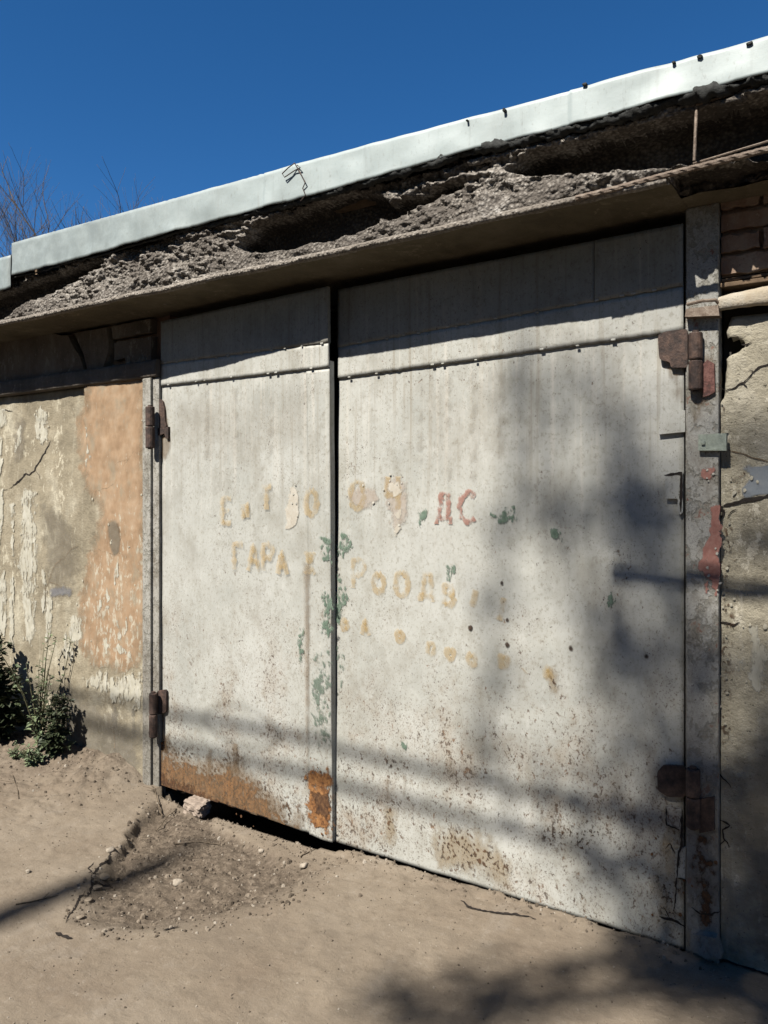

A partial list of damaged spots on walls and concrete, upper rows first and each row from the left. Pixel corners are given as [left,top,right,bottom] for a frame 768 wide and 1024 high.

spalling [519,104,768,196]
spalling [247,185,465,253]
spalling [0,266,102,320]
crack [721,342,768,391]
peeling [34,406,49,445]
crack [3,442,50,490]
peeling [730,465,768,498]
peeling [0,488,52,646]
peeling [60,378,145,710]
rust [161,740,335,838]